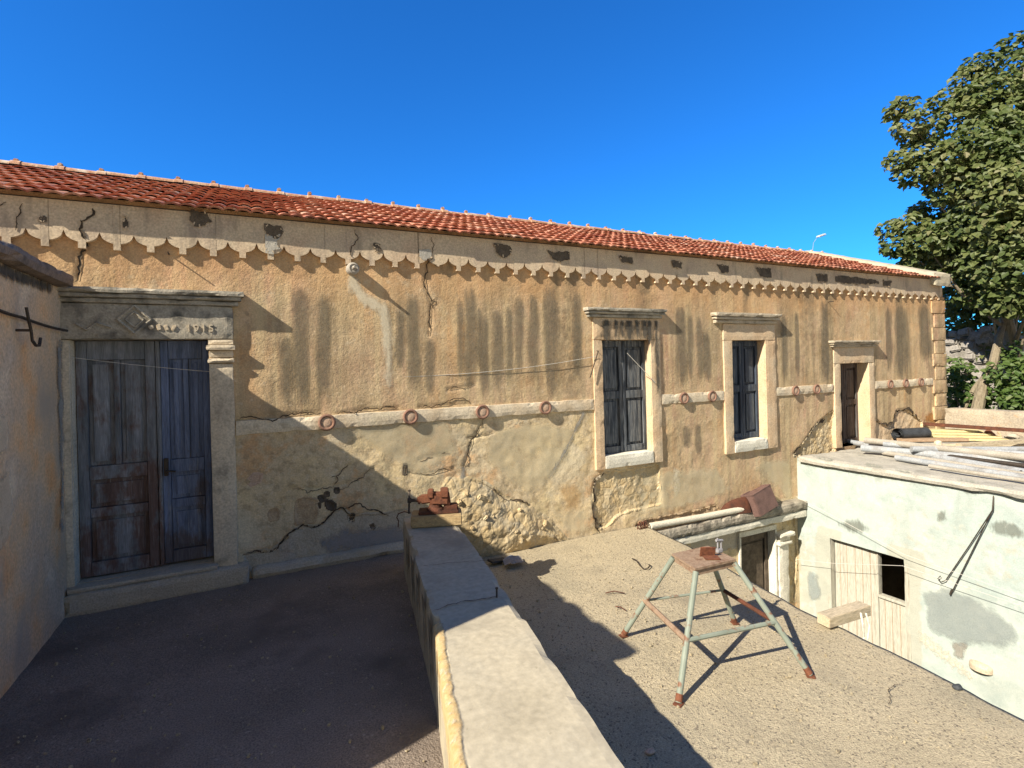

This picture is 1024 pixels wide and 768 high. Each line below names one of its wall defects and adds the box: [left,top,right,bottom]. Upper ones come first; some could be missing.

crack [77,208,95,277]
crack [423,237,434,333]
spalling [548,250,570,263]
leakage [348,275,433,389]
leakage [457,292,555,391]
leakage [573,298,581,368]
leakage [676,309,710,379]
crack [410,386,529,506]
spalling [793,410,836,457]
spalling [875,408,923,441]
crack [244,465,387,555]
spalling [242,487,412,572]